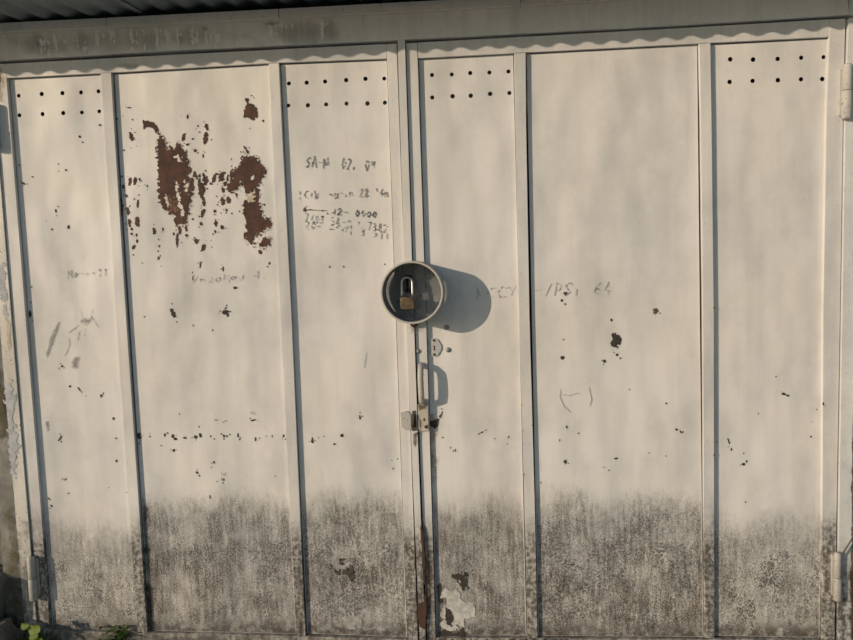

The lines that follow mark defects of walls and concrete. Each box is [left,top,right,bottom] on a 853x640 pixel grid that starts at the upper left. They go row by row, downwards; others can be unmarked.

peeling [3,378,22,479]
corrosion [414,405,443,469]
water stain [48,536,138,630]
water stain [143,501,296,634]
water stain [302,501,406,637]
peeling [437,572,476,636]
water stain [434,499,526,635]
water stain [537,502,703,636]
water stain [714,532,820,637]